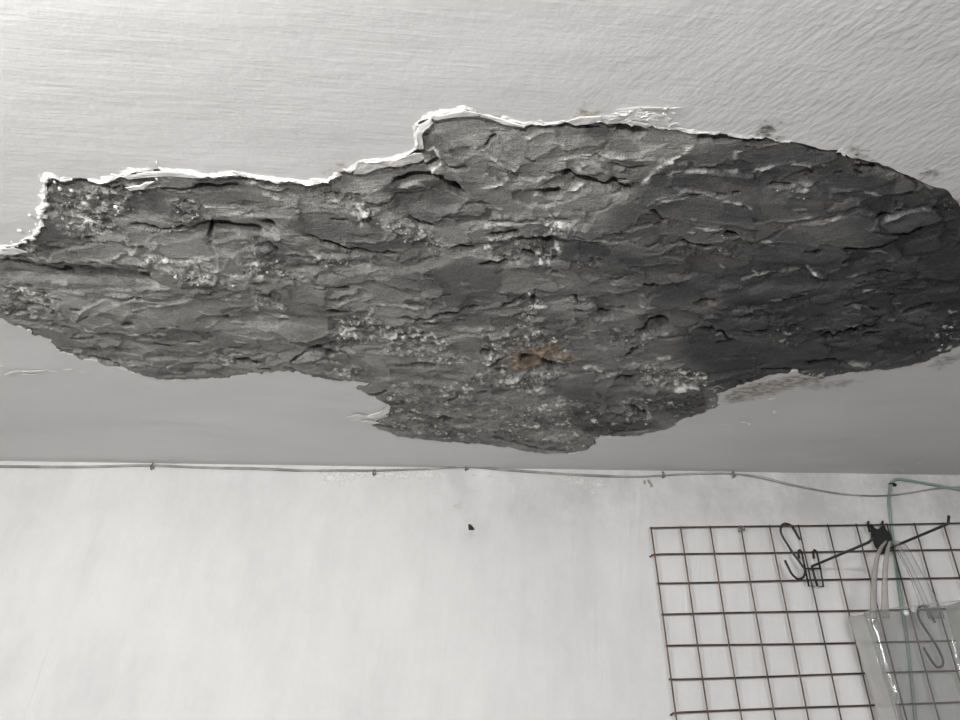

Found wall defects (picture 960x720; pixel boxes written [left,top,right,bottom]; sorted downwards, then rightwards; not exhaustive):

spalling [0,105,960,454]